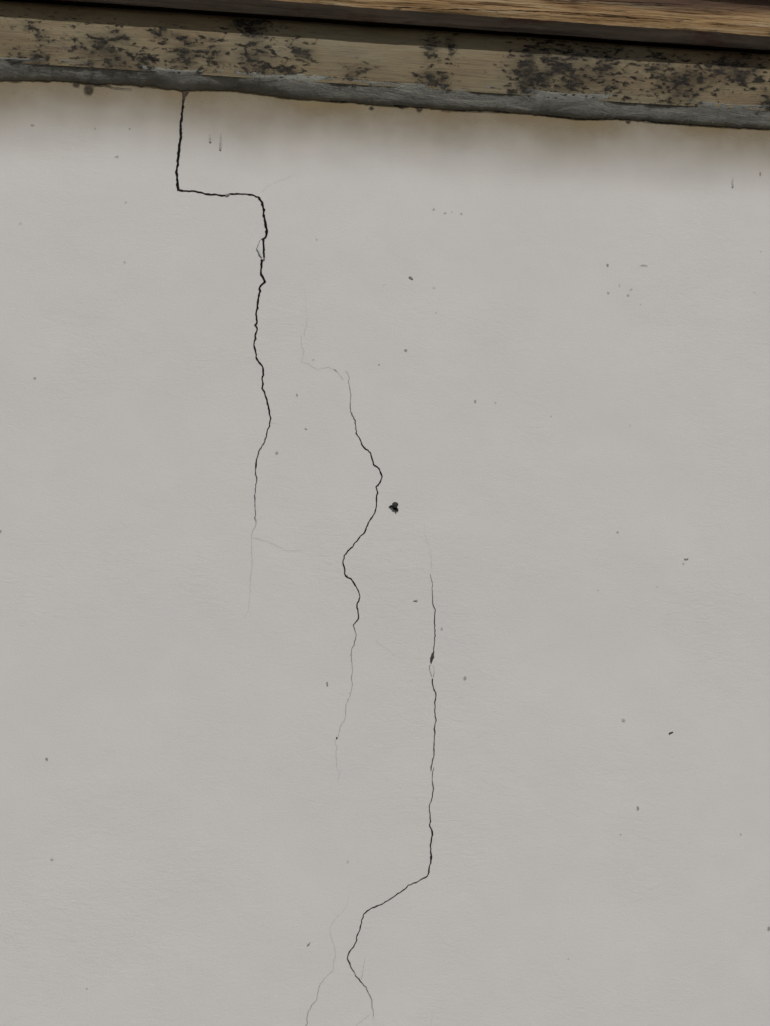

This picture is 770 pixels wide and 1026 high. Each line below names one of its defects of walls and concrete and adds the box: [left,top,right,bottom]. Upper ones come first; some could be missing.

water stain [5,14,319,79]
water stain [411,31,458,91]
water stain [484,38,770,112]
water stain [0,80,770,147]
crack [175,90,271,519]
crack [342,403,383,645]
crack [347,579,437,1000]